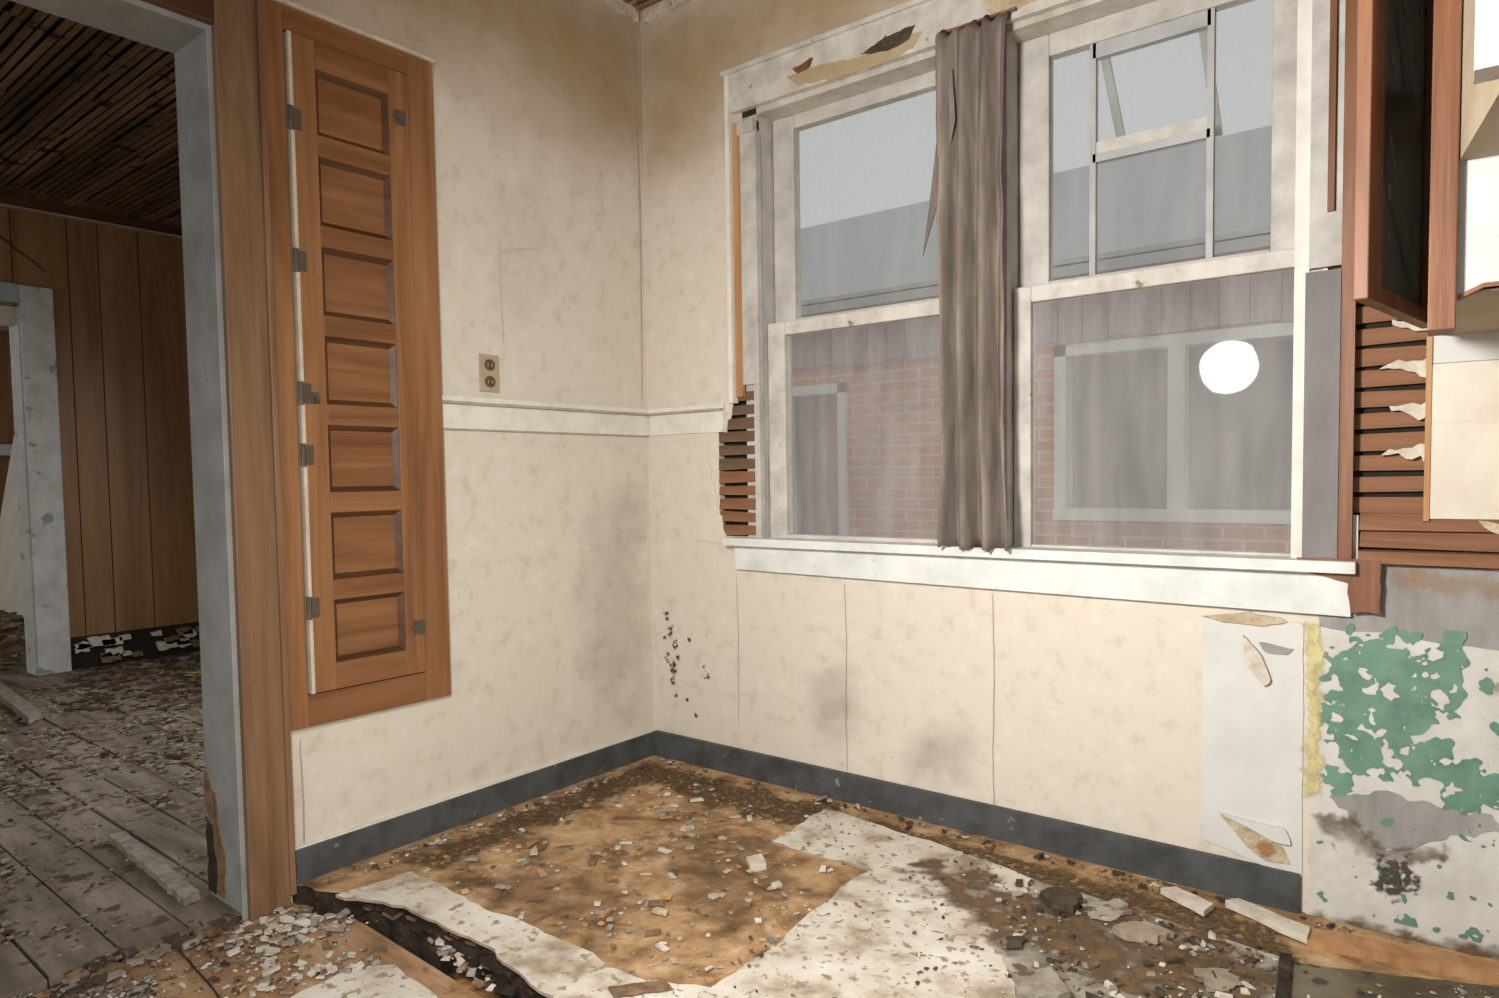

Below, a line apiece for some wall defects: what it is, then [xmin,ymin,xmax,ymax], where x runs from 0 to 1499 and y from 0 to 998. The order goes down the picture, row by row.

peeling [787,25,922,86]
spalling [724,386,748,536]
spalling [70,622,200,670]
peeling [1219,304,1499,959]
leakage [403,761,834,869]
leakage [1319,815,1447,902]
crack [178,949,221,998]
leakage [858,816,1299,998]
leakage [1344,920,1499,959]